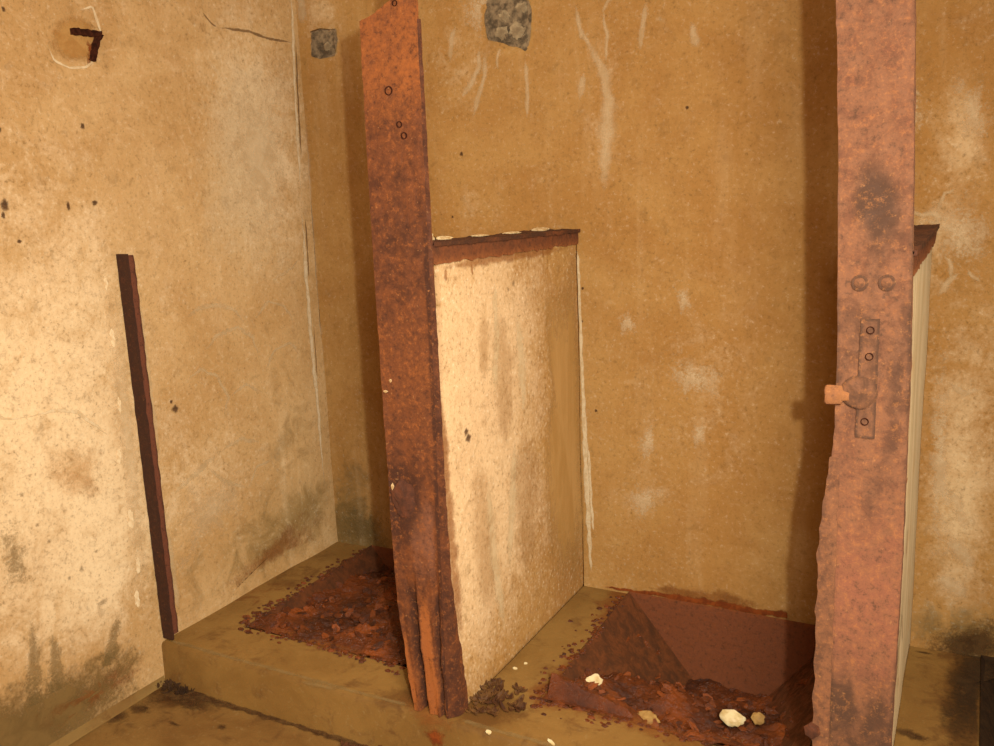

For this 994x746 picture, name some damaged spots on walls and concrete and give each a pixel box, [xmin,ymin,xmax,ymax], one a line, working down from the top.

crack [205,15,301,148]
damp [594,21,613,170]
crack [303,222,311,274]
damp [919,628,994,656]
damp [0,652,214,746]
damp [896,729,922,740]